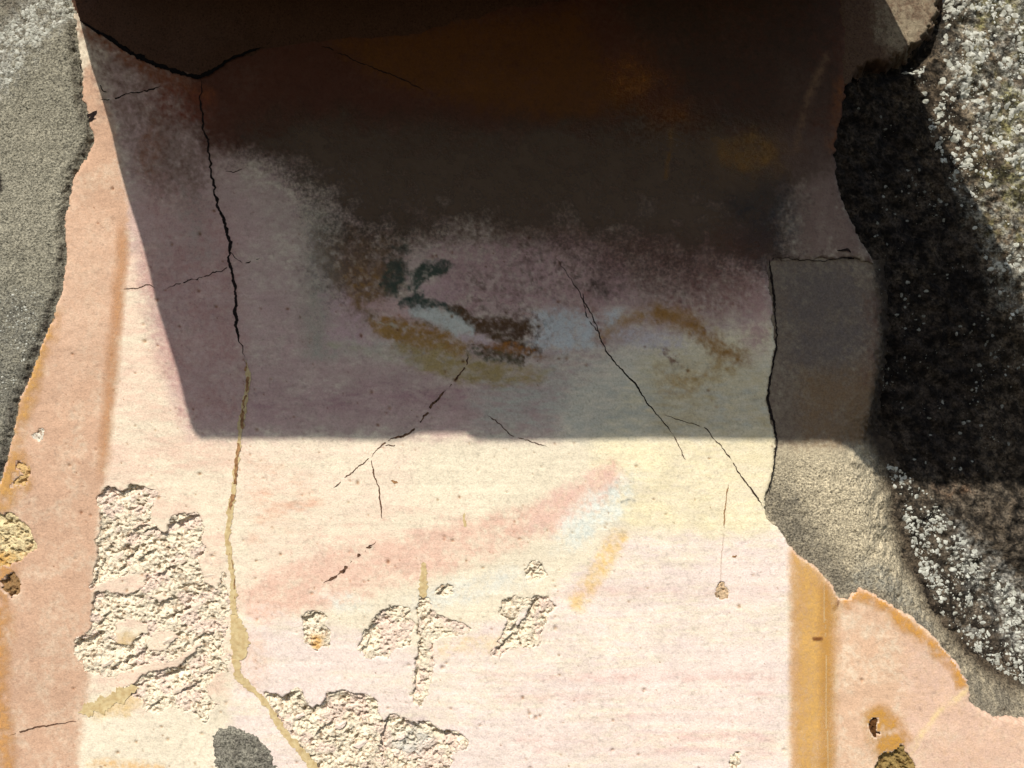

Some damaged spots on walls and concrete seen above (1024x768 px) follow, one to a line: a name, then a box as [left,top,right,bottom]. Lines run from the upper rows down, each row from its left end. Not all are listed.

crack [81,21,318,768]
crack [325,355,469,582]
crack [555,248,854,576]
flaking render [0,512,37,596]
flaking render [73,485,232,722]
flaking render [303,610,331,651]
flaking render [357,583,471,707]
flaking render [489,595,556,659]
corrosion [793,556,966,768]
flaking render [264,687,469,768]
flaking render [869,718,880,737]
flaking render [875,745,915,768]